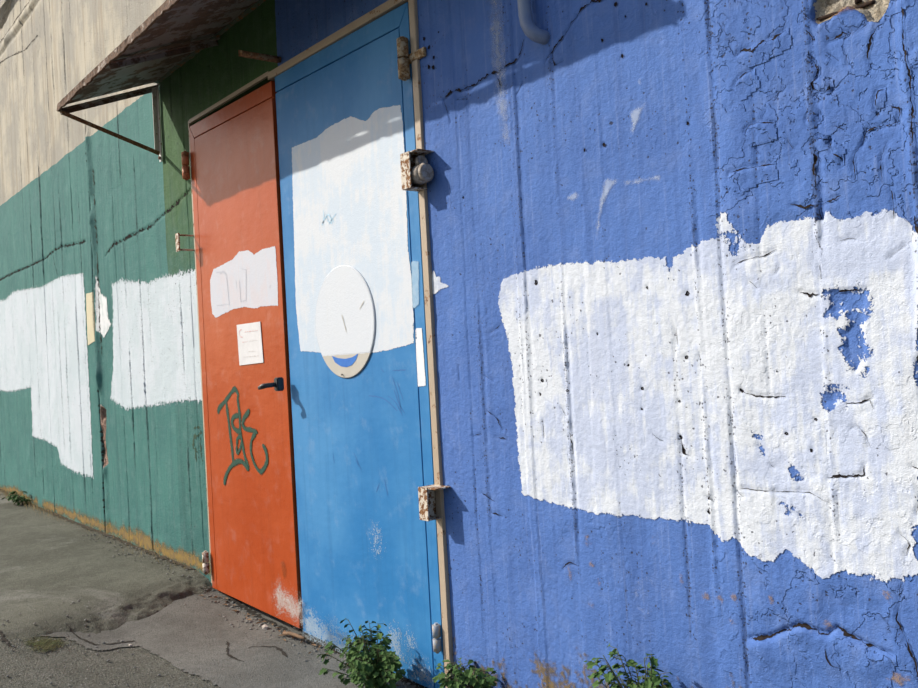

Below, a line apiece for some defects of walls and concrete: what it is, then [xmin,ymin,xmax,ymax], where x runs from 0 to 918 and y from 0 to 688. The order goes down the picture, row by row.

crack [549,0,601,66]
crack [803,13,878,65]
spalling [813,0,890,24]
crack [444,40,524,123]
crack [852,0,918,251]
crack [789,143,841,219]
crack [0,160,188,355]
crack [801,238,867,297]
crack [97,390,106,525]
leakage [0,486,211,574]